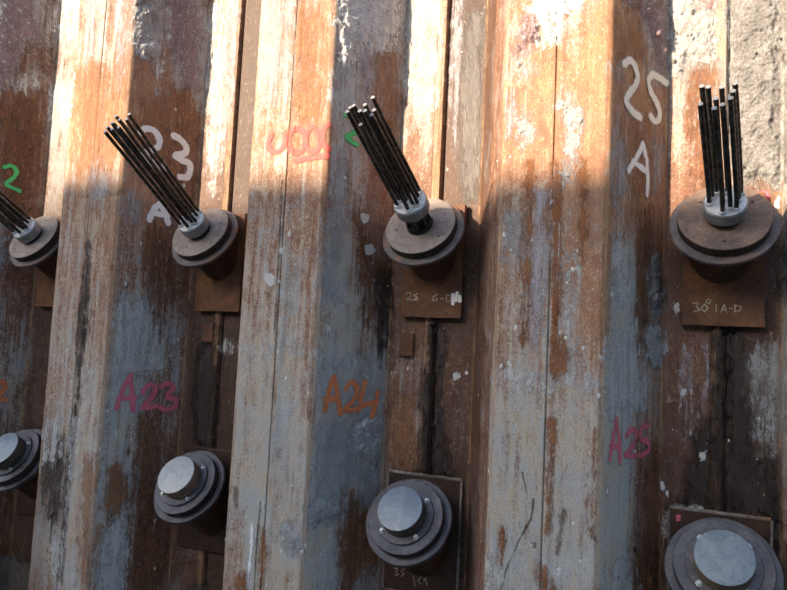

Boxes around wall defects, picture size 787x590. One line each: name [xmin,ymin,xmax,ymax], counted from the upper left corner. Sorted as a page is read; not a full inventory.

corrosion [69,53,126,183]
corrosion [135,86,198,186]
leakage [455,9,487,225]
leakage [0,554,31,590]
corrosion [76,412,167,590]
corrosion [334,489,368,590]
corrosion [544,417,557,534]
corrosion [630,444,672,590]
leakage [676,326,783,557]